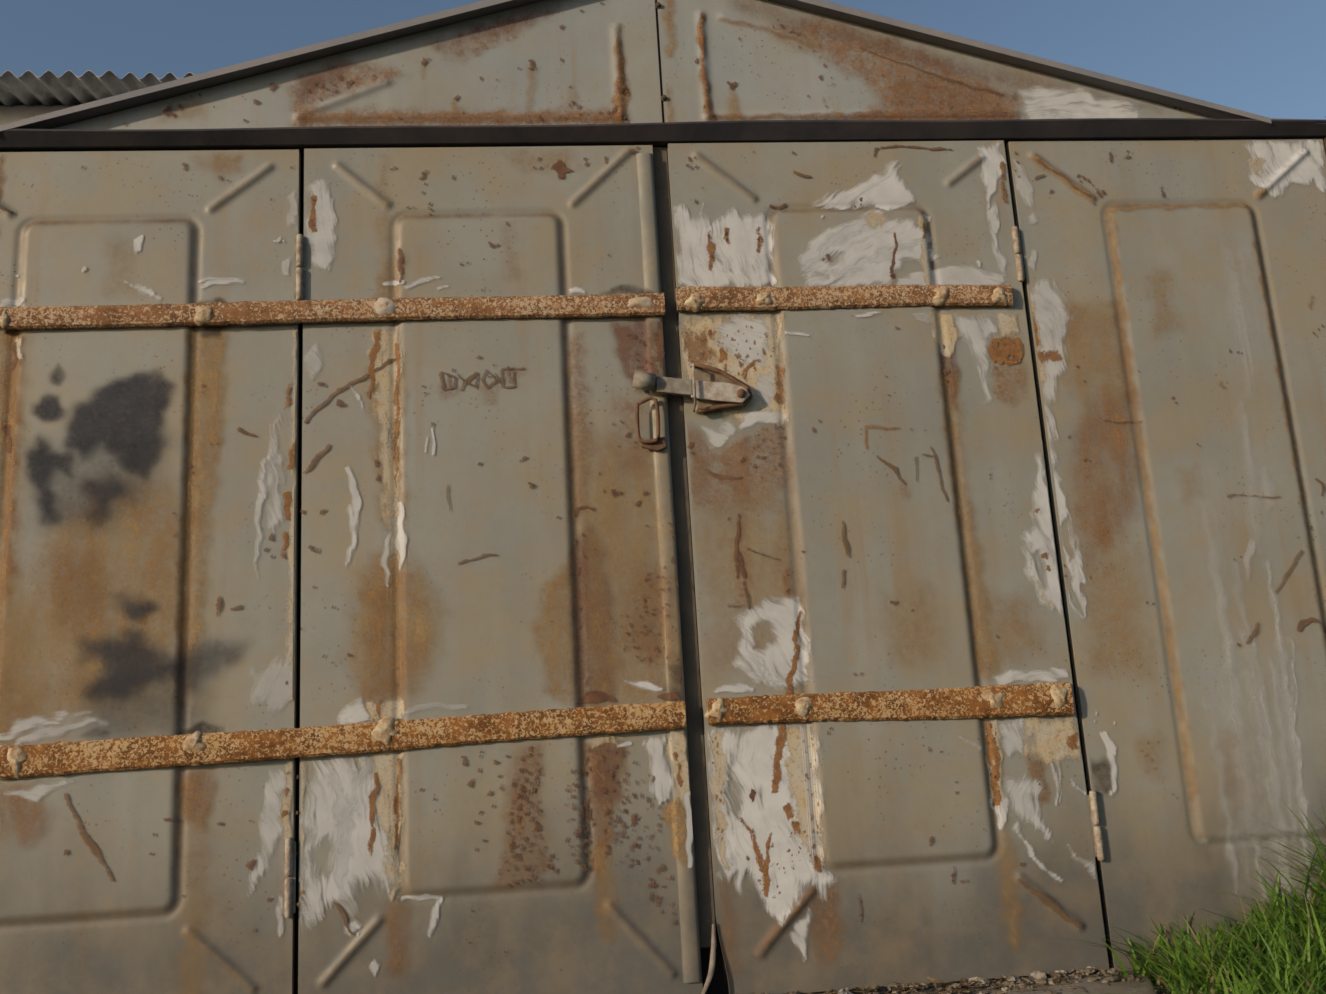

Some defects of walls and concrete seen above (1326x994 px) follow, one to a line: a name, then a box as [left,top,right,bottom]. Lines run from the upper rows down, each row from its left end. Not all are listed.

corrosion [294,36,630,126]
corrosion [694,13,783,121]
corrosion [738,19,1015,120]
peeling [308,195,318,232]
peeling [706,227,730,271]
corrosion [614,321,665,382]
peeling [774,364,785,405]
peeling [1032,312,1062,363]
peeling [785,611,802,695]
peeling [367,759,402,856]
corrosion [461,742,677,925]
peeling [772,722,801,836]